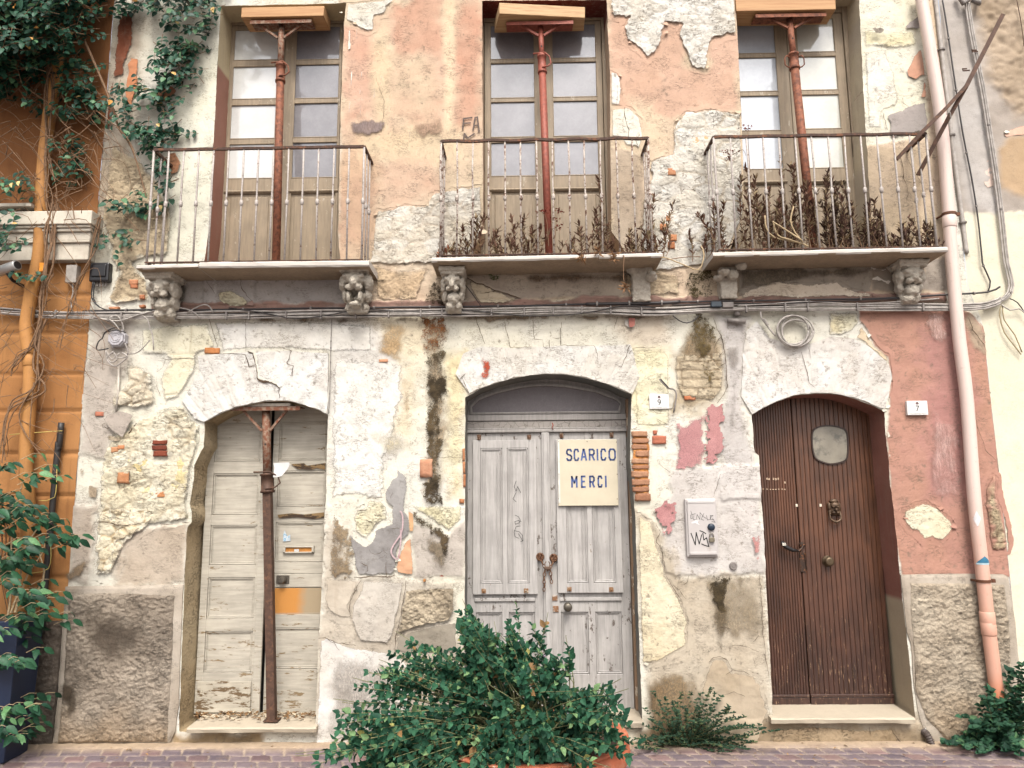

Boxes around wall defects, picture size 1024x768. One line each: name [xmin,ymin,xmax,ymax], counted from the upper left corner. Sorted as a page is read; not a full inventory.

peeling [607,0,737,75]
peeling [363,179,487,300]
peeling [610,68,742,302]
flaking render [99,322,402,547]
crack [209,279,294,398]
damp [381,317,449,504]
spalling [631,351,723,671]
peeling [897,498,958,548]